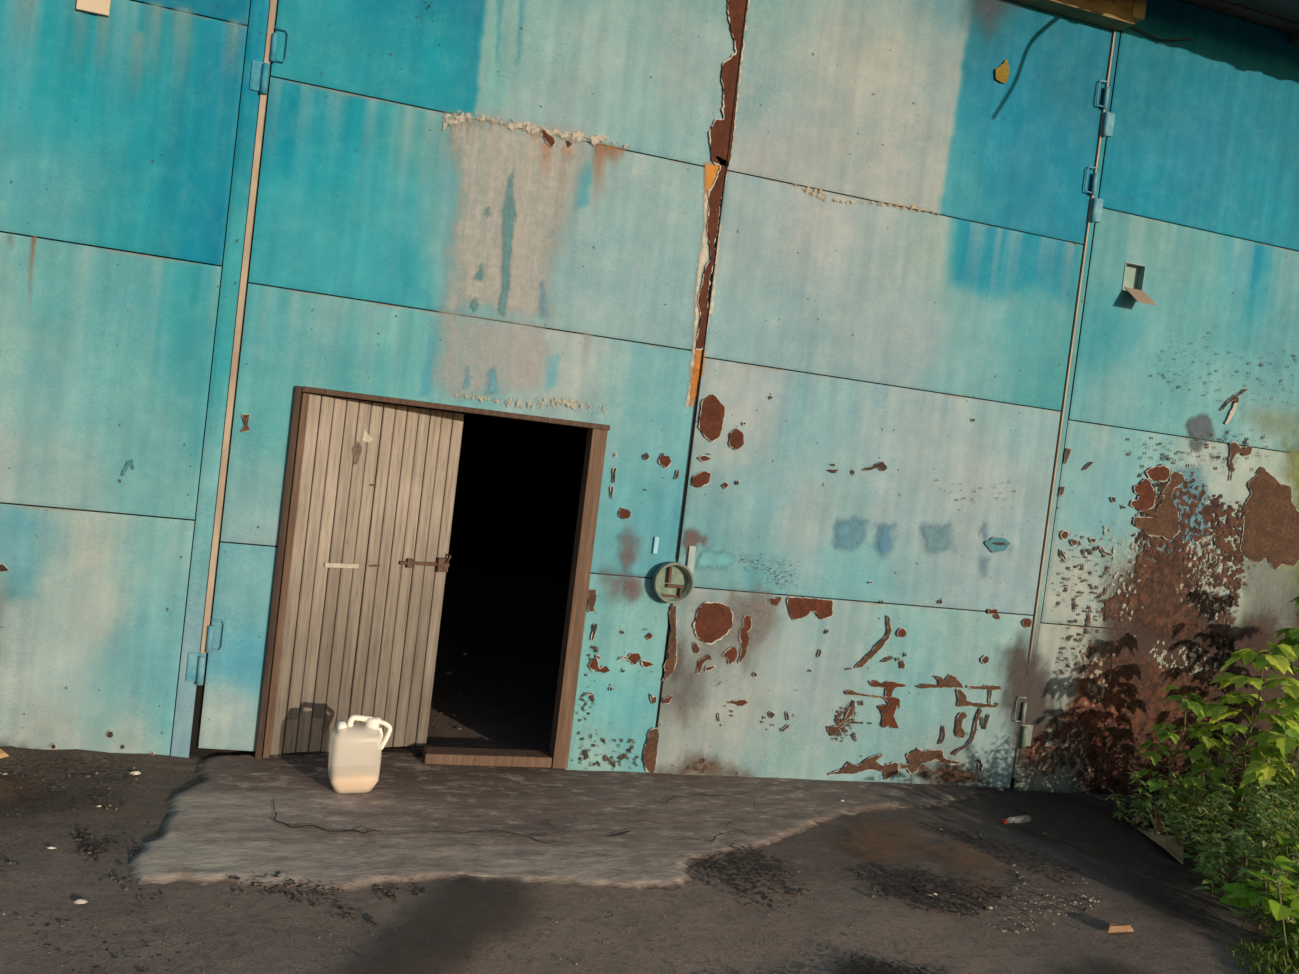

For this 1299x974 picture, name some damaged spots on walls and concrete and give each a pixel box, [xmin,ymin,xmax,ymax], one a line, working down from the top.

peeling [443,110,632,147]
peeling [696,0,750,350]
water stain [1288,448,1299,490]
water stain [1245,558,1299,628]
corrosion [1069,556,1299,801]